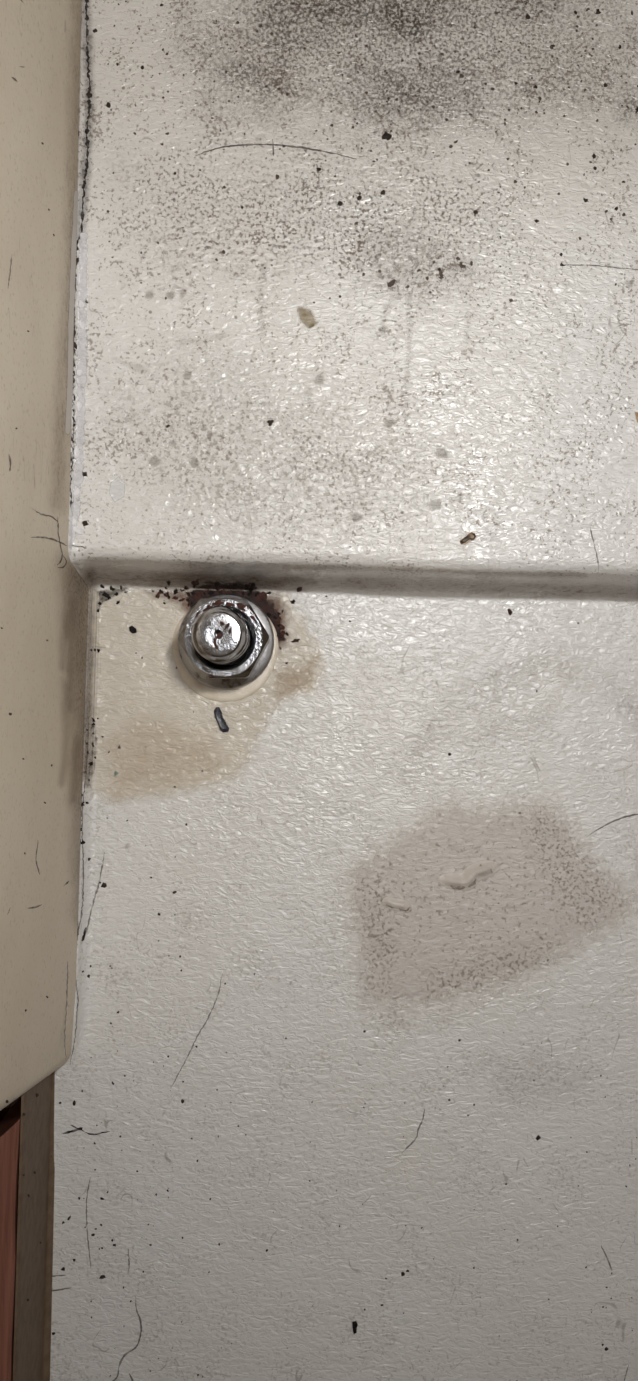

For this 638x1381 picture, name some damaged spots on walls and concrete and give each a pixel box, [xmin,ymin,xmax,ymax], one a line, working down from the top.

leakage [162,0,638,162]
leakage [432,134,528,231]
rust [152,580,302,665]